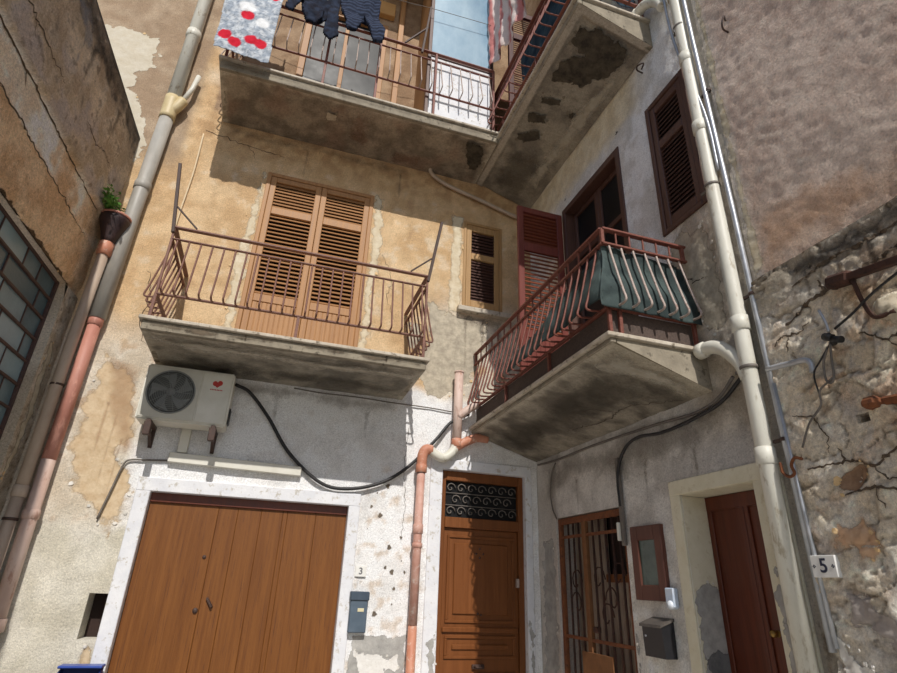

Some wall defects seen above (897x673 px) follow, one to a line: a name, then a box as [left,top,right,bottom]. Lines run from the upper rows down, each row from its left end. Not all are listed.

crack [28,0,65,83]
crack [0,14,97,237]
flaking render [105,24,162,162]
crack [774,221,897,353]
damp [598,359,683,392]
flaking render [67,353,135,536]
spalling [832,519,882,562]
peeling [353,649,399,673]